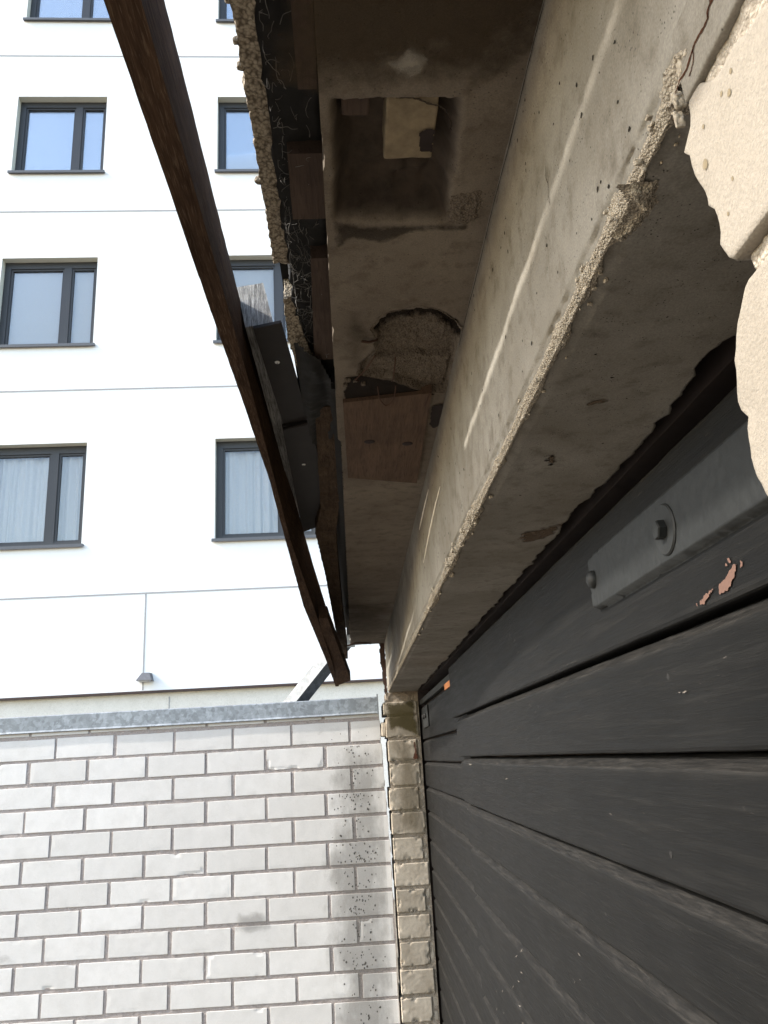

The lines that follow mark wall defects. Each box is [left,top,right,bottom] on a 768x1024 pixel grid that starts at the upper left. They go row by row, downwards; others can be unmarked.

spalling [343,305,463,407]
spalling [388,49,690,692]
peeling [696,558,742,605]
damp [326,746,386,970]